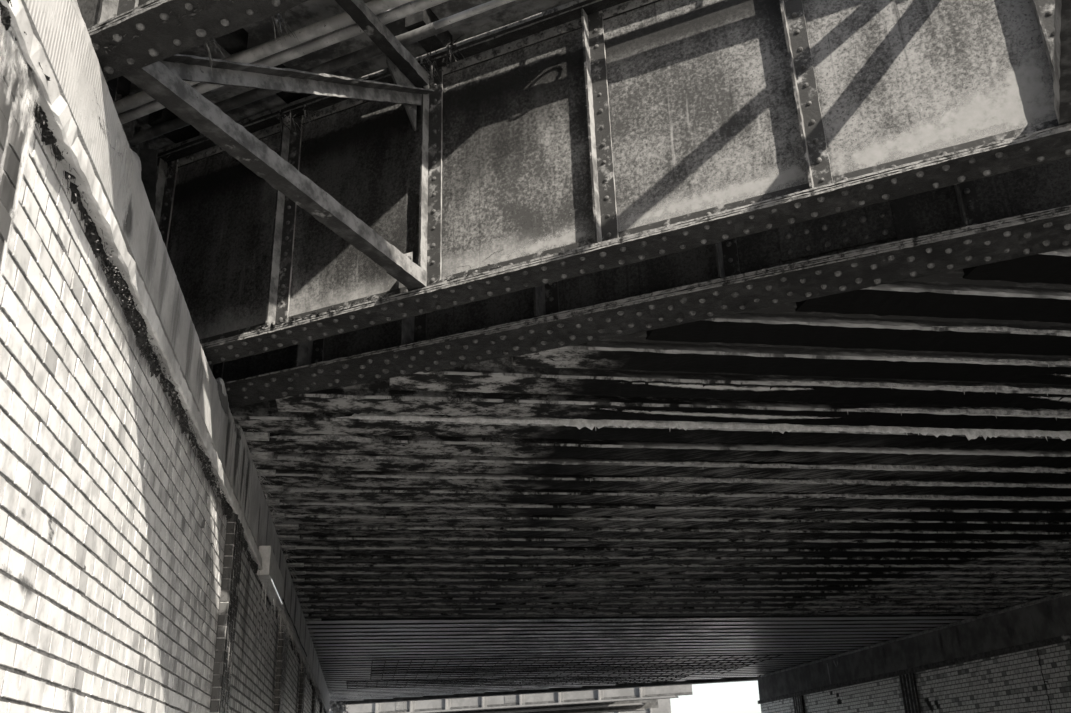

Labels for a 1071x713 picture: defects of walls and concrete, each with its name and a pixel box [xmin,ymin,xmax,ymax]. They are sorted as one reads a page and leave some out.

damp [336,356,1071,441]